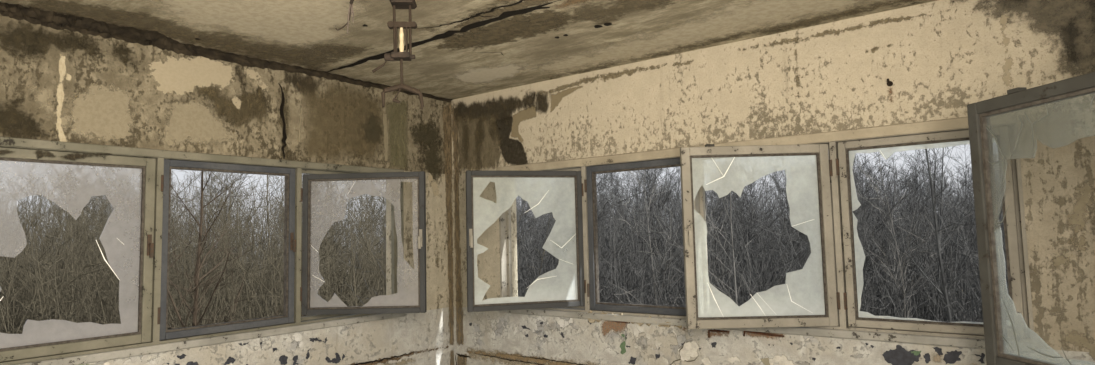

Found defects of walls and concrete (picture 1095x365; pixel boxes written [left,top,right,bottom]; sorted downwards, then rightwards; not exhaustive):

crack [325,0,561,73]
leakage [633,0,916,60]
leakage [976,0,1095,87]
leakage [0,22,100,142]
leakage [30,0,389,161]
crack [278,83,287,159]
leakage [451,91,548,173]
peeling [238,337,329,365]
peeling [325,353,348,364]
spalling [587,310,685,365]
peeling [672,330,729,365]
peeling [865,343,985,365]